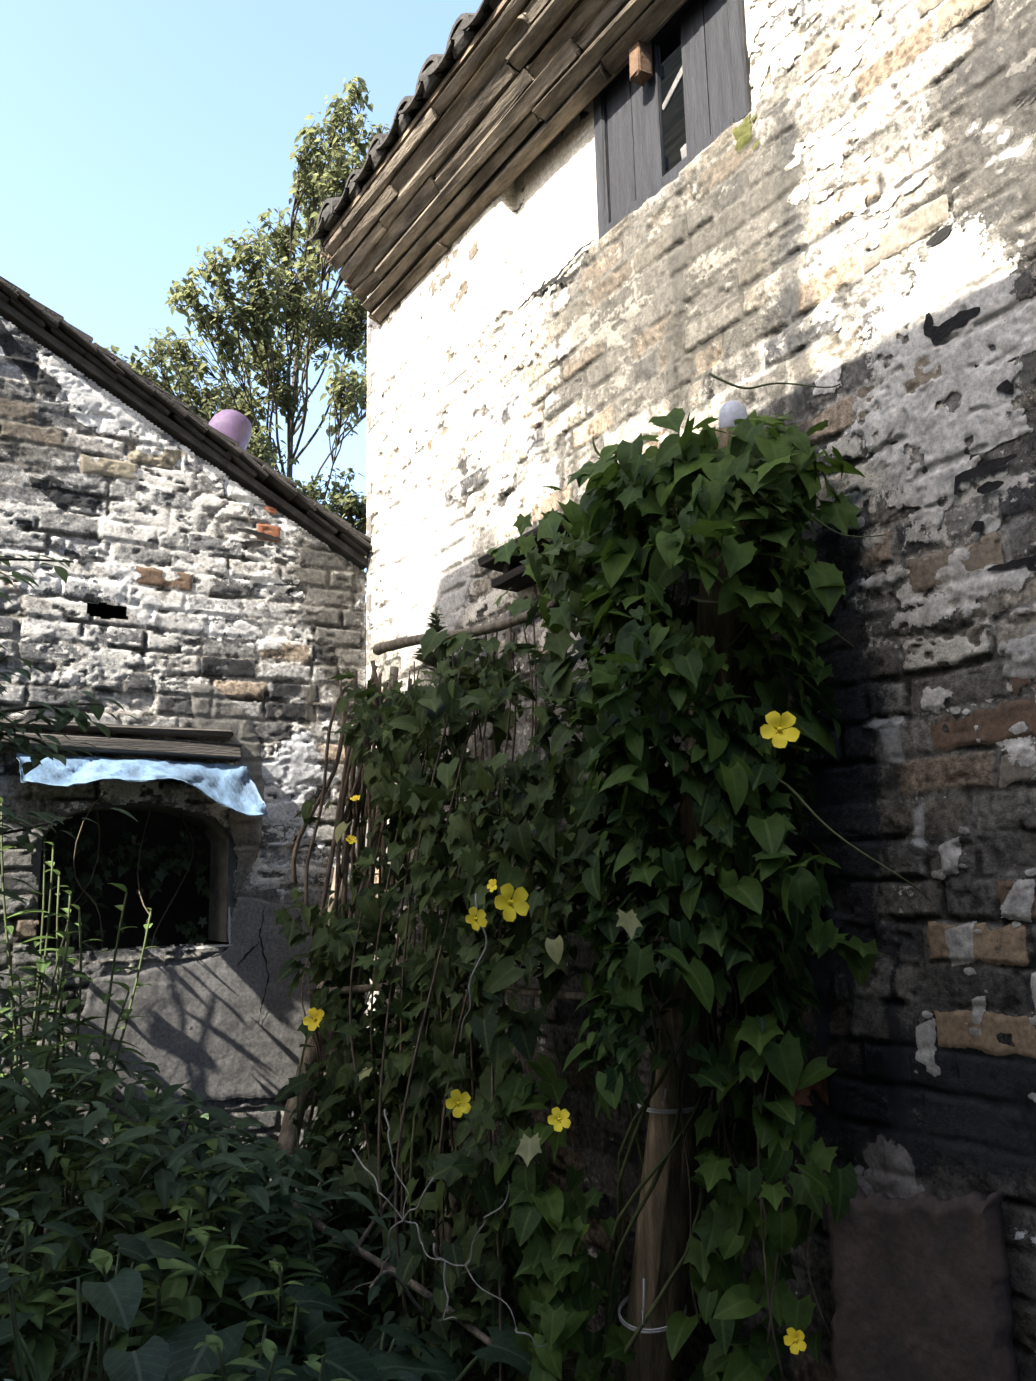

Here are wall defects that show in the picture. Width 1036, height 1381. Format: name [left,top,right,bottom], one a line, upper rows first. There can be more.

flaking render [0,316,301,547]
peeling [784,116,1036,632]
peeling [998,625,1036,679]
peeling [868,715,904,764]
peeling [912,805,970,880]
crack [237,907,270,1023]
flaking render [914,867,1036,1077]
spalling [854,1134,927,1199]